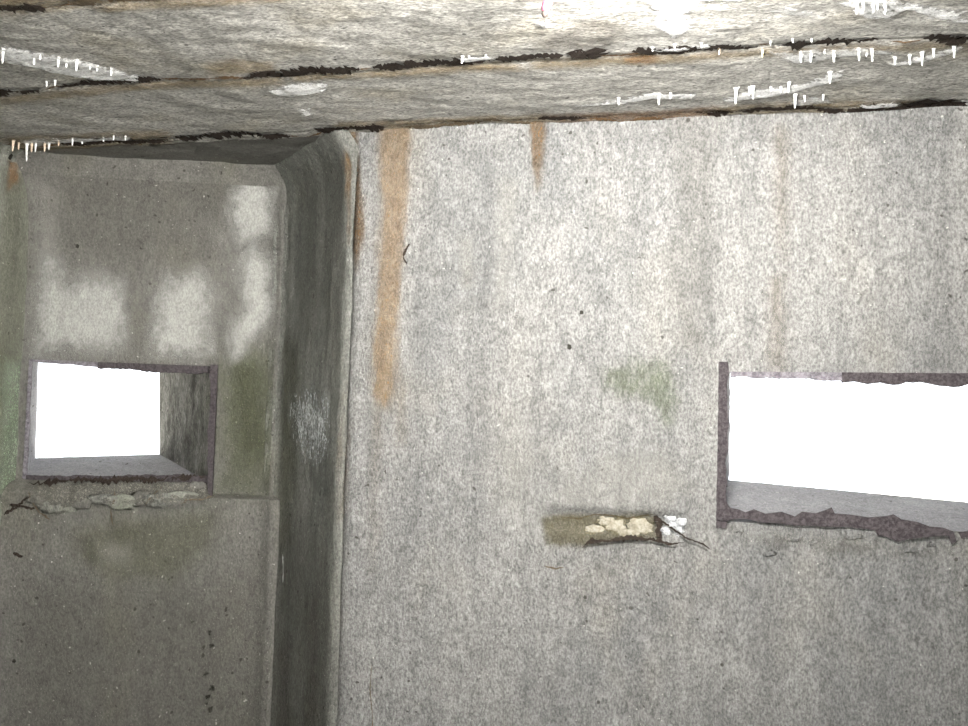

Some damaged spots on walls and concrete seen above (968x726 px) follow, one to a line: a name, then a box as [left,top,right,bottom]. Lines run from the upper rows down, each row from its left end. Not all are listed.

efflorescence [619,0,745,55]
efflorescence [840,0,968,24]
efflorescence [0,46,138,87]
efflorescence [579,92,695,107]
efflorescence [725,38,963,108]
efflorescence [11,135,130,161]
corrosion [530,121,545,179]
water stain [231,185,271,359]
water stain [35,257,126,352]
water stain [151,272,212,356]
efflorescence [290,393,330,464]
spalling [544,514,711,550]